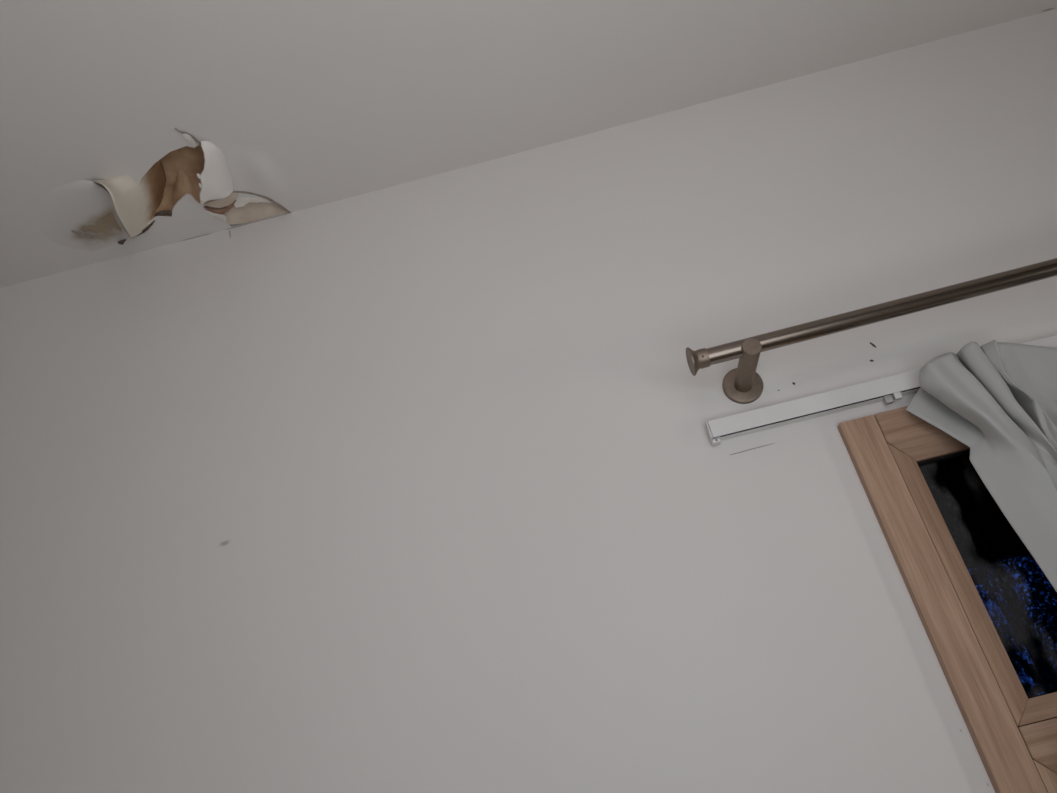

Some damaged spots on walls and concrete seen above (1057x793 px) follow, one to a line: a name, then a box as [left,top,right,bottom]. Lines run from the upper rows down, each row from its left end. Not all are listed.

spalling [150,145,289,225]